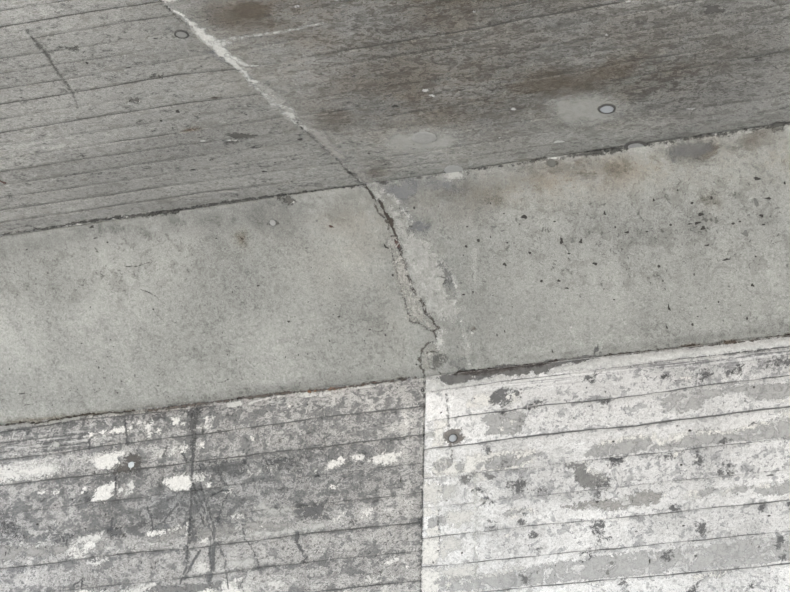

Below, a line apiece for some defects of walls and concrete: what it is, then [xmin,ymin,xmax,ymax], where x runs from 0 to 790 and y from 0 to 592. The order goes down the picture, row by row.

water stain [162,0,345,163]
crack [226,62,441,592]
spalling [421,344,638,436]
peeling [83,420,162,439]
peeling [0,461,66,484]
peeling [81,480,135,505]
peeling [91,448,127,471]
peeling [161,472,212,492]
peeling [312,449,402,474]
peeling [420,419,790,592]
peeling [0,503,324,568]
peeling [120,558,254,592]